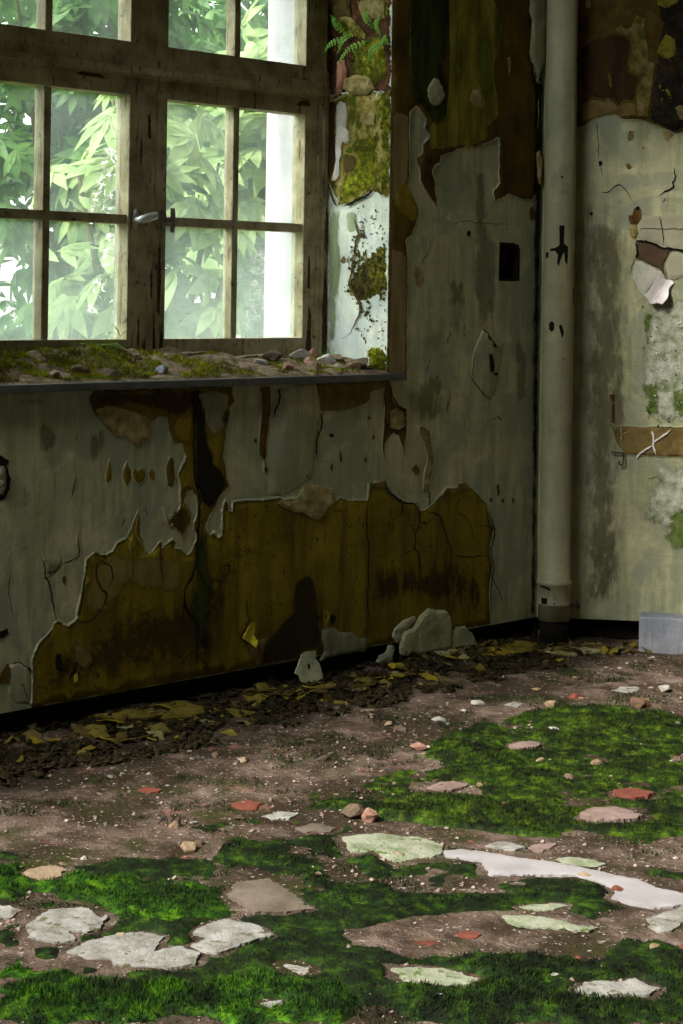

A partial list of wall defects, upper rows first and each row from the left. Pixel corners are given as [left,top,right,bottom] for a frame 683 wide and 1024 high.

flaking render [576,0,683,149]
damp [329,204,387,339]
flaking render [633,239,683,295]
flaking render [30,0,539,708]
crack [41,508,148,624]
crack [366,381,503,639]